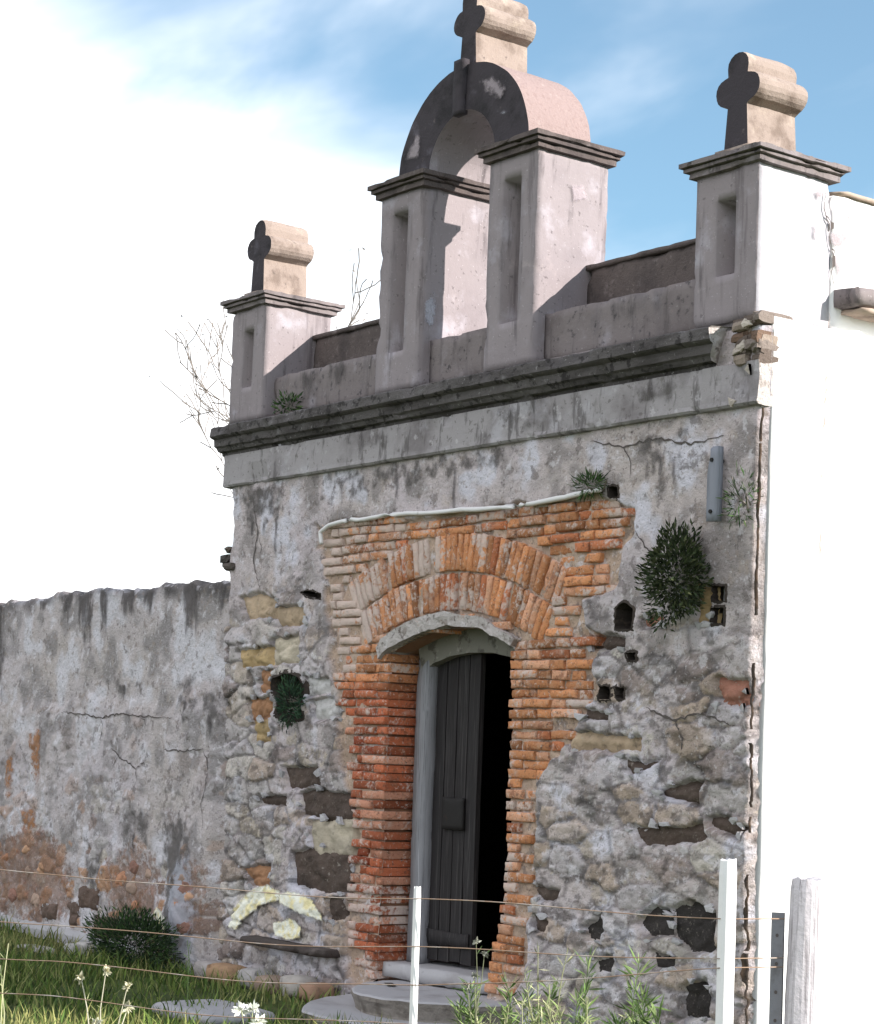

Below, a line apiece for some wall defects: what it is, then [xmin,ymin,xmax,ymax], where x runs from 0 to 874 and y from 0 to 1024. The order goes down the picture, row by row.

spalling [731,310,793,375]
damp [377,448,503,501]
crack [590,435,724,478]
damp [243,487,282,548]
damp [64,588,106,640]
damp [122,586,169,613]
damp [183,581,197,633]
crack [61,711,208,826]
flaking render [228,500,658,996]
spalling [624,743,754,847]
spalling [636,902,716,972]
spalling [740,874,751,1024]